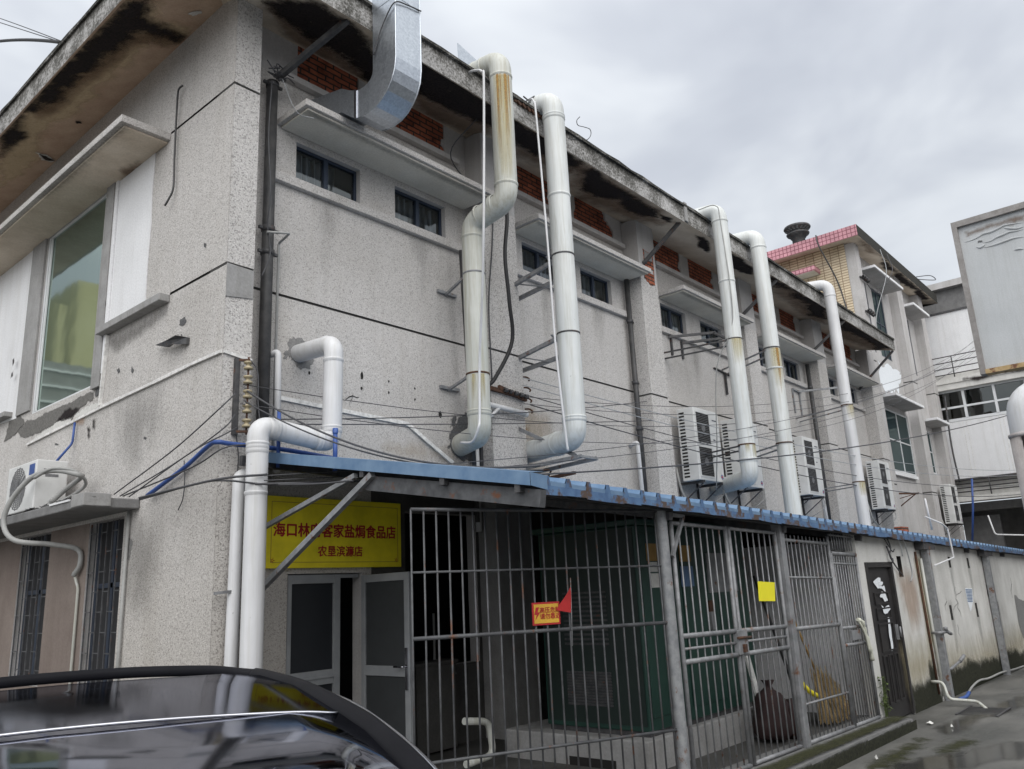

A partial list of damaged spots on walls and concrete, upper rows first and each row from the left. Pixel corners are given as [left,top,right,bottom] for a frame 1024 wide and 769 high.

leakage [263,0,373,82]
leakage [0,0,190,184]
spalling [297,46,358,93]
spalling [396,108,444,151]
leakage [514,120,546,164]
spalling [517,166,548,205]
leakage [567,152,672,223]
spalling [570,194,620,241]
spalling [643,240,713,289]
peeling [878,361,901,394]
peeling [33,387,100,445]
leakage [912,649,1024,713]